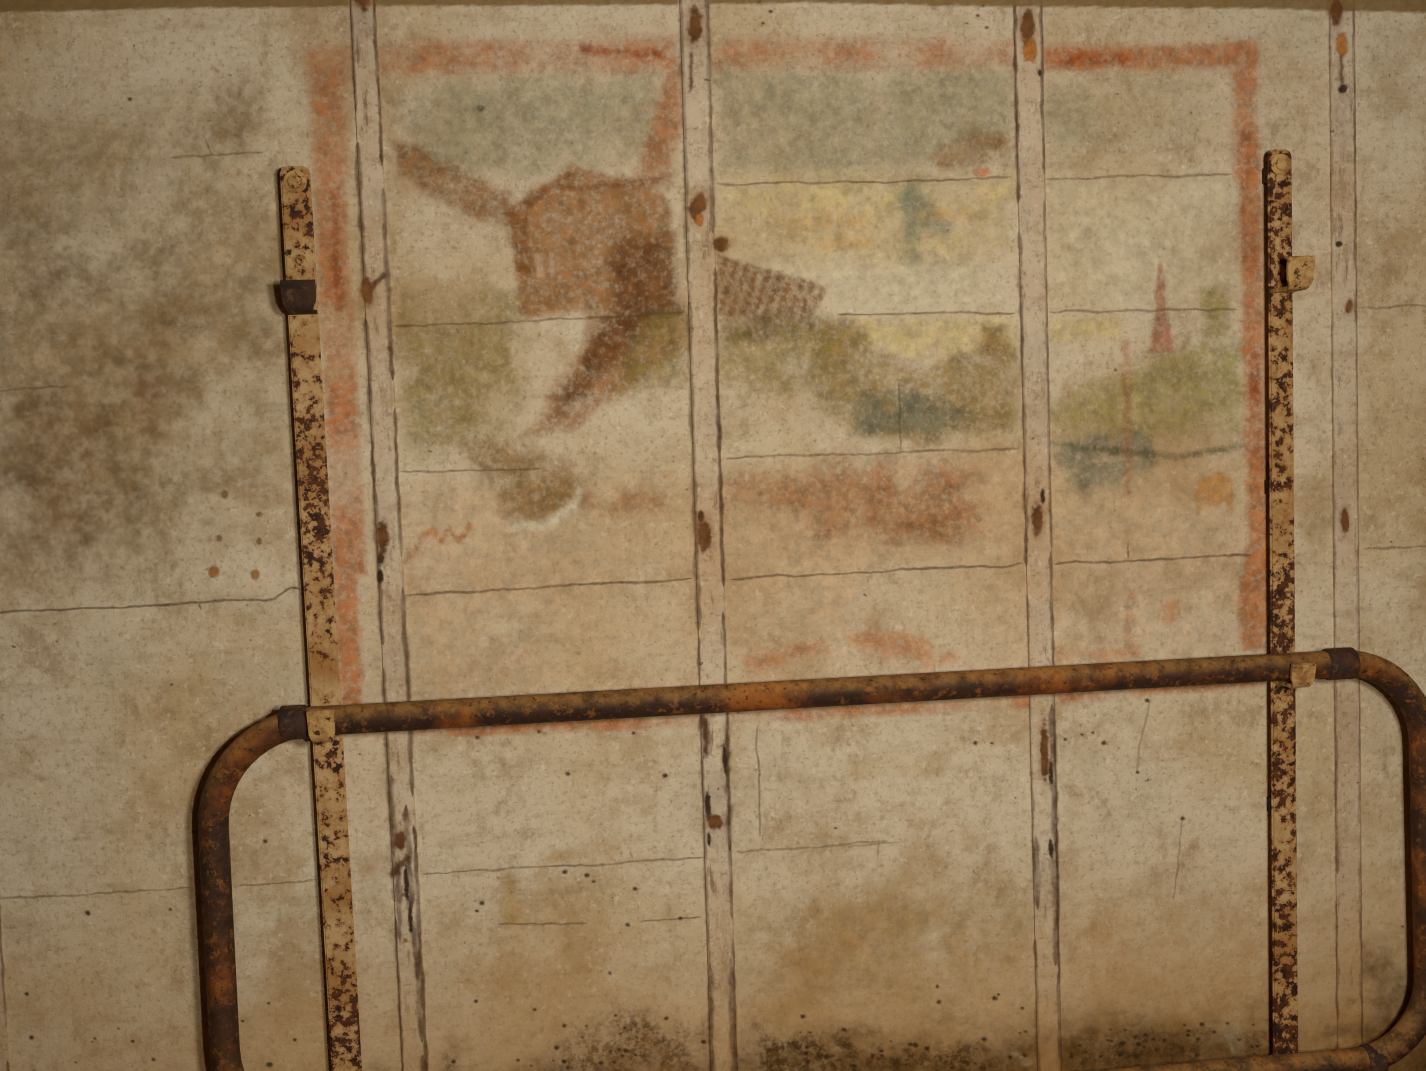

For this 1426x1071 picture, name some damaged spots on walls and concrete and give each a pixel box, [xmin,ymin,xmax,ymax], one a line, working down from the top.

rust [688,8,702,88]
rust [1021,10,1042,76]
rust [1330,0,1347,93]
rust [689,194,706,226]
rust [713,238,728,252]
rust [361,273,385,303]
rust [377,522,389,582]
rust [698,511,711,551]
rust [1032,490,1045,535]
rust [1040,724,1053,783]
water stain [583,1025,688,1071]
water stain [763,1040,1022,1071]